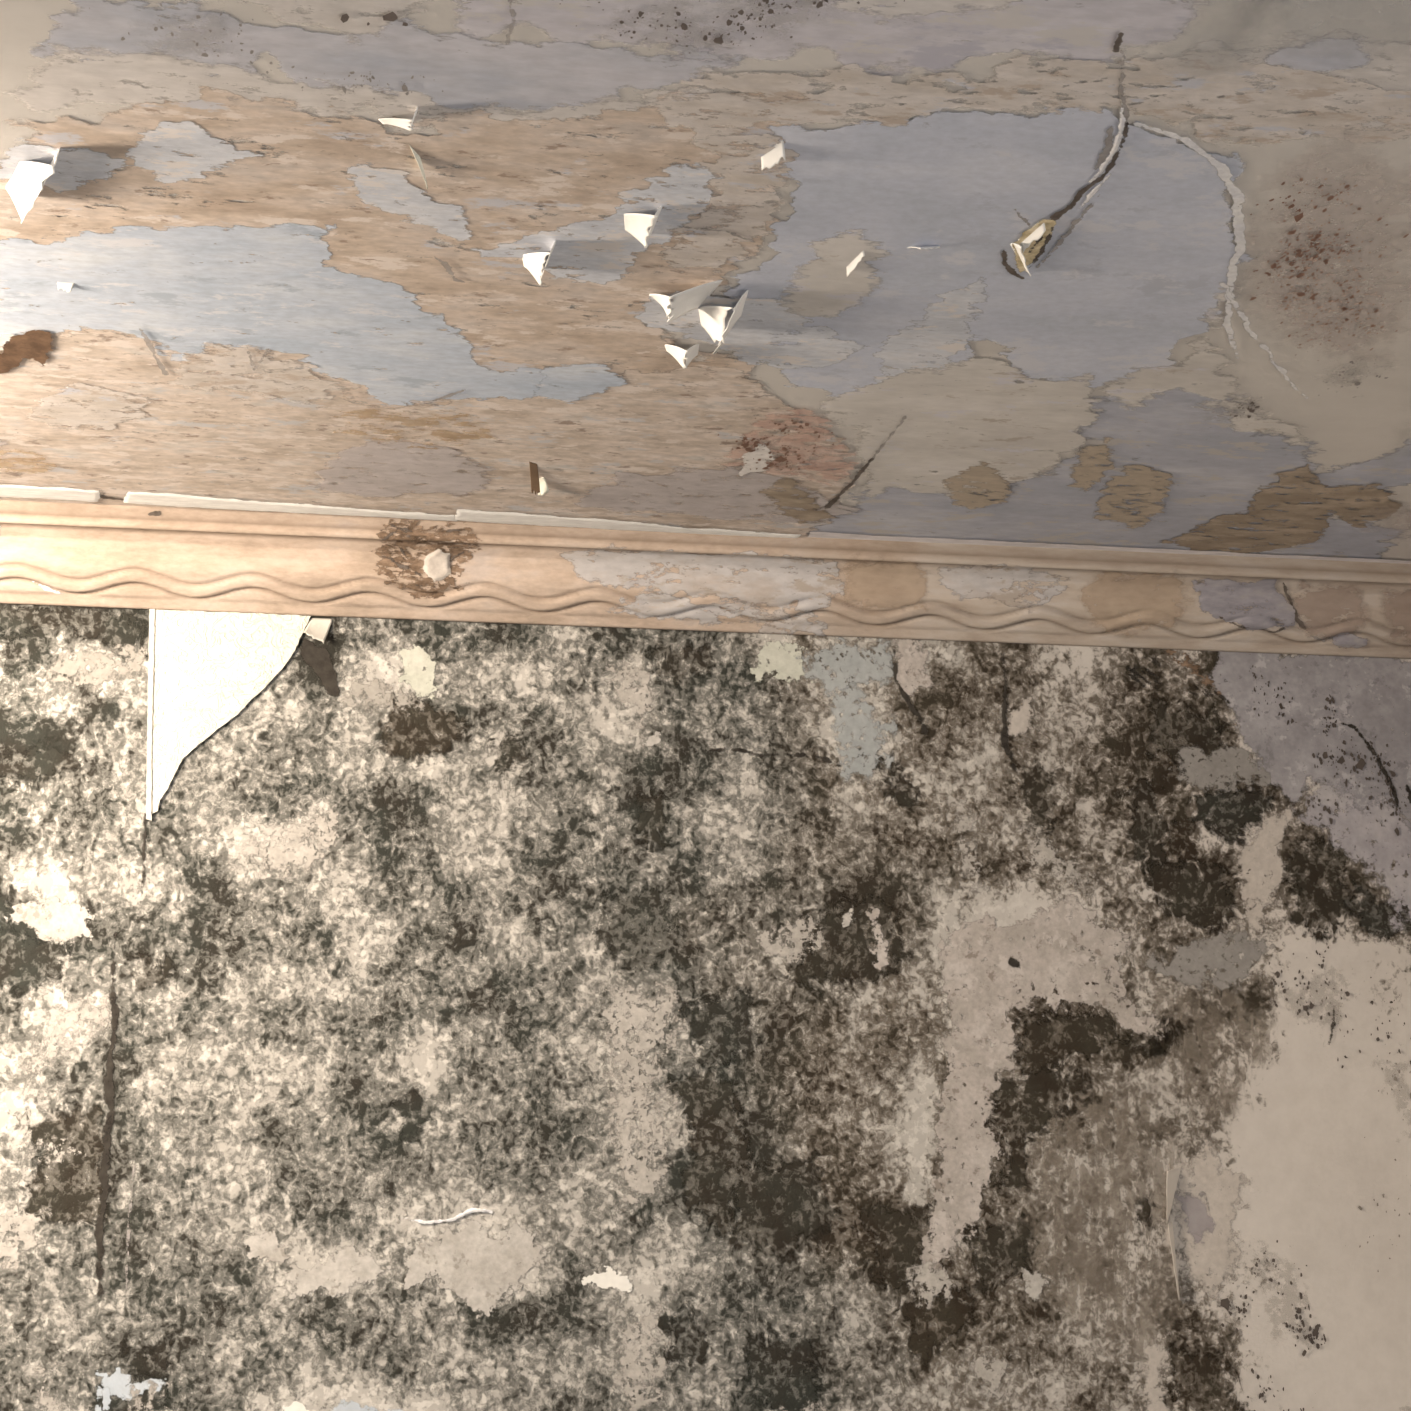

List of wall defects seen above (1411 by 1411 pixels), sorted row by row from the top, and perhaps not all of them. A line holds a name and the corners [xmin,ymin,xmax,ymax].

damp [367,12,408,26]
damp [598,0,828,58]
crack [1001,33,1129,279]
peeling [0,0,1411,781]
damp [1238,177,1402,398]
crack [140,813,148,895]
peeling [1146,632,1411,993]
crack [1341,723,1411,823]
crack [94,932,135,1296]